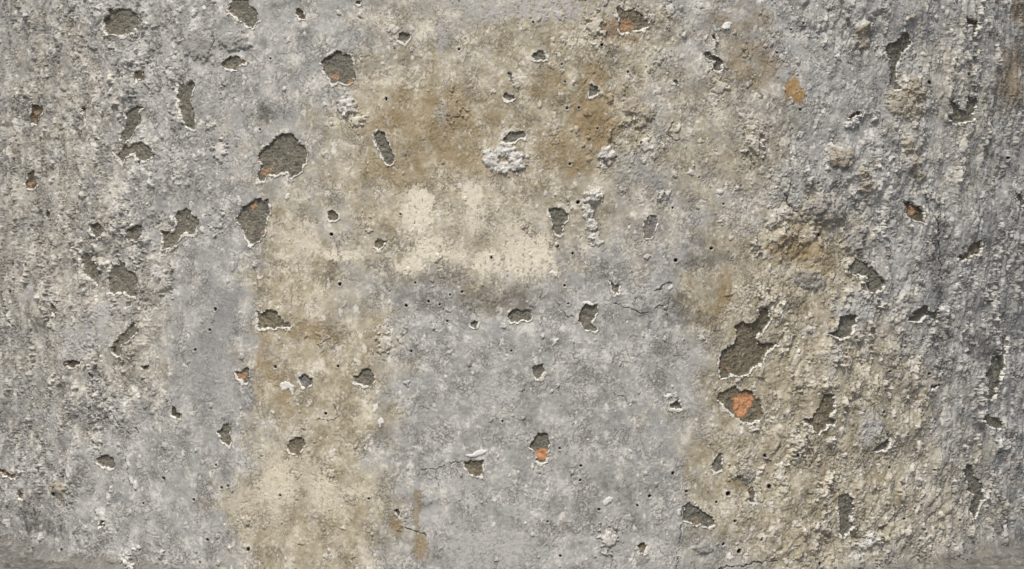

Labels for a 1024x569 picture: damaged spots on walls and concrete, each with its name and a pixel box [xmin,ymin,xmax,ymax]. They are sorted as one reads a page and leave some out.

spalling [101,7,139,39]
spalling [319,50,355,87]
spalling [173,79,197,133]
spalling [255,132,308,185]
spalling [159,208,199,253]
spalling [235,198,271,248]
spalling [254,308,292,331]
spalling [578,301,599,334]
spalling [826,314,860,341]
spalling [716,306,781,426]
spalling [802,392,837,437]
spalling [528,433,551,466]